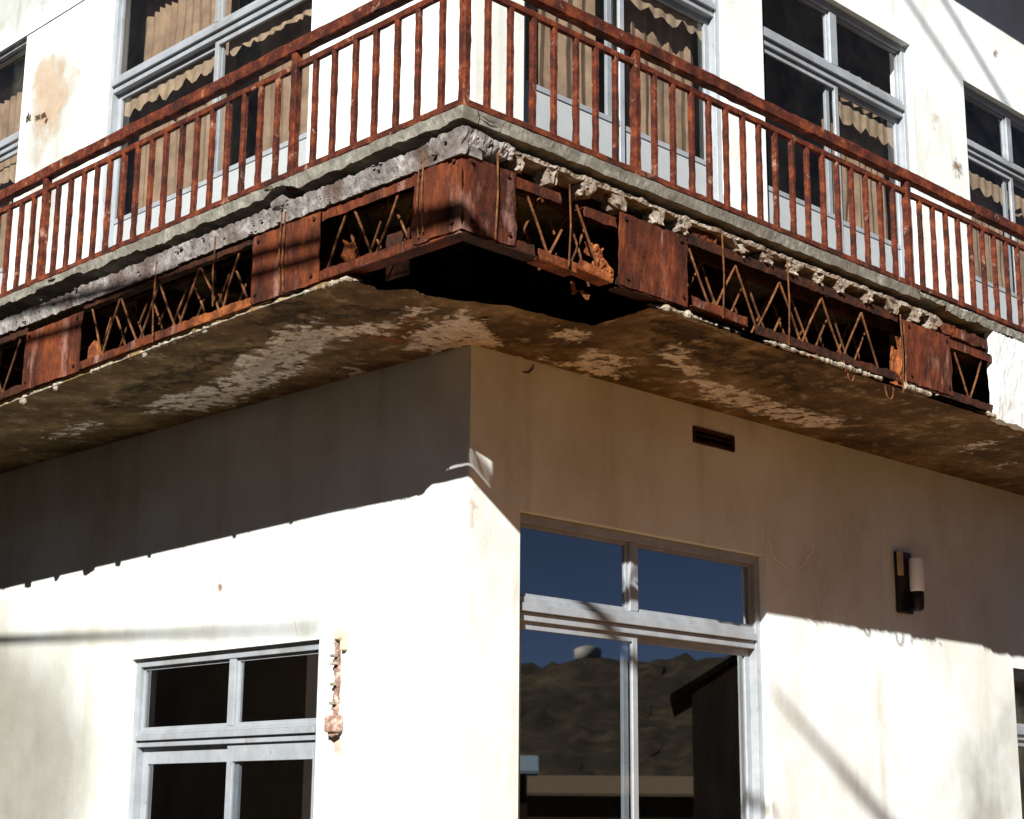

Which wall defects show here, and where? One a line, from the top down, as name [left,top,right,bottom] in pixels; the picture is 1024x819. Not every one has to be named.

spalling [0,125,988,352]
leakage [248,302,403,334]
leakage [93,340,251,408]
leakage [650,320,825,390]